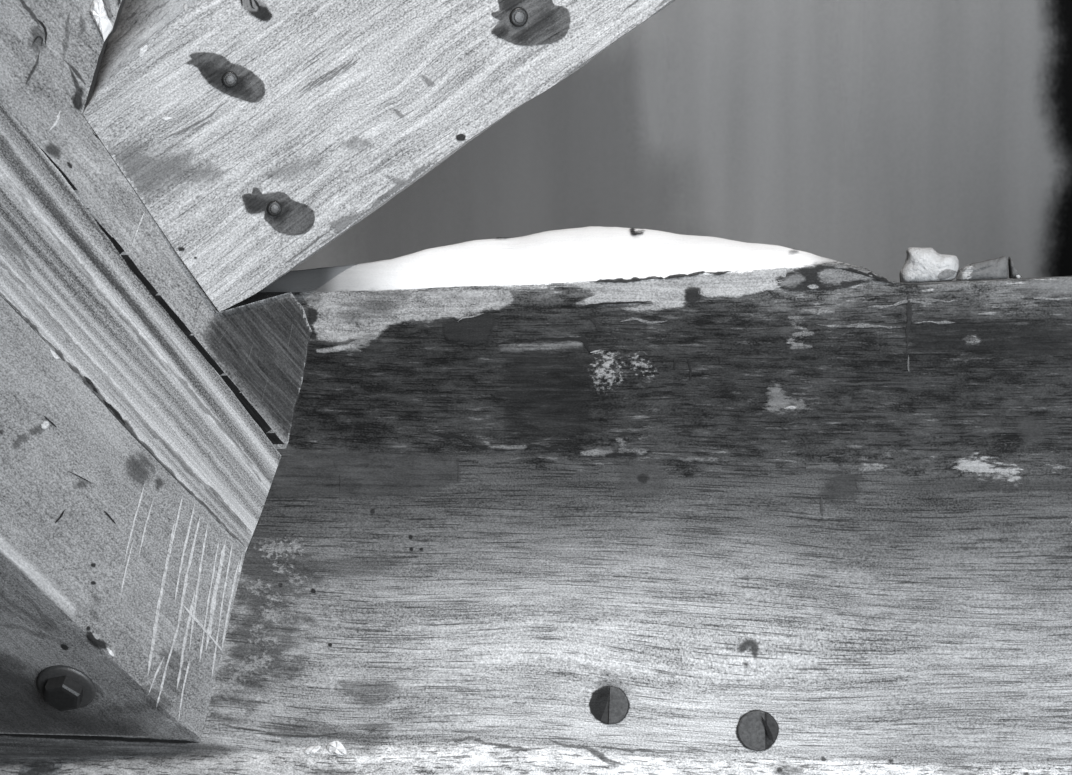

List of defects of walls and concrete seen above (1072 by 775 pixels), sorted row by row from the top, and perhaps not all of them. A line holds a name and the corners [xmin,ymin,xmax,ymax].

peeling [766,384,806,414]
peeling [955,452,1023,481]